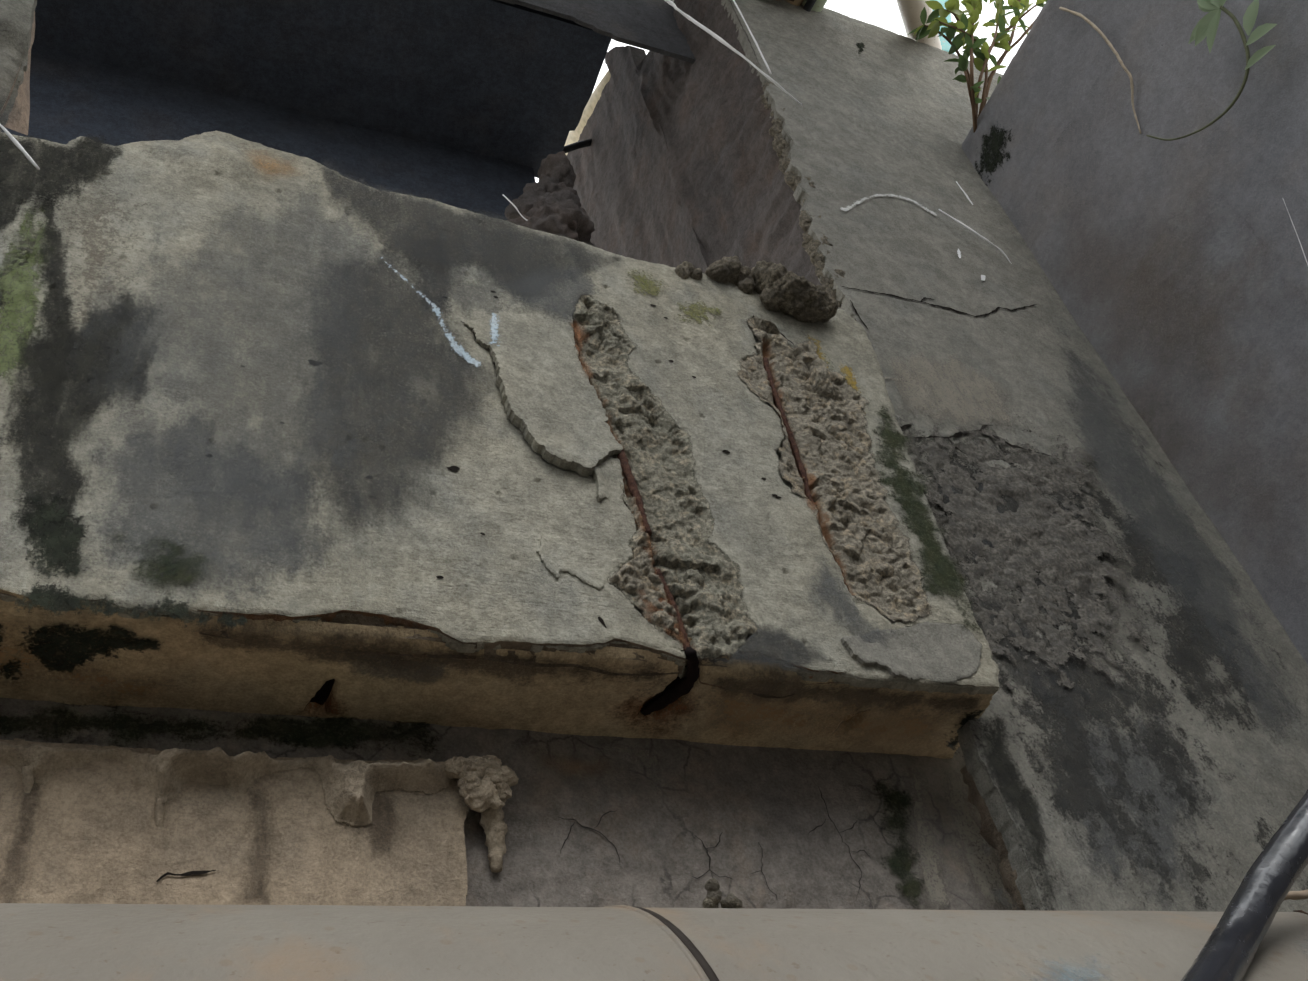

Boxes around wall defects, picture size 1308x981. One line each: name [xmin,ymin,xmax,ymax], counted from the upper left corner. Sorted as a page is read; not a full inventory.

flaking render [760,82,849,308]
water stain [975,125,1011,186]
crack [842,286,1037,329]
water stain [0,98,614,902]
spalling [197,290,844,716]
rust [618,650,699,733]
crack [560,811,620,863]
crack [692,833,777,898]
crack [808,784,869,899]
water stain [907,772,1012,908]
water stain [947,710,1055,908]